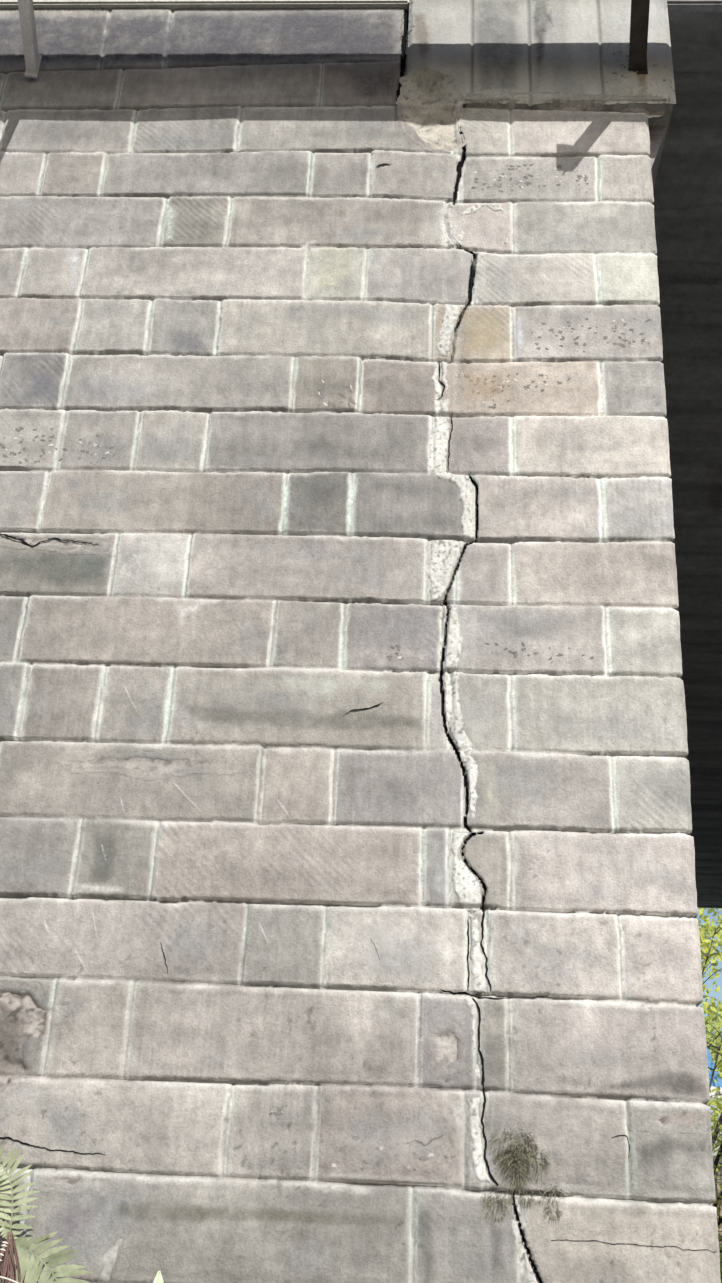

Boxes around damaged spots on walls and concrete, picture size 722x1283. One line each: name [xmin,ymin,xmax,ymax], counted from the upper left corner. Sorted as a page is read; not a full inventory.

crack [396,9,411,98]
spalling [396,63,667,156]
crack [0,534,97,547]
crack [343,702,383,716]
crack [436,126,713,1283]
crack [0,1137,104,1155]
crack [407,1136,441,1146]